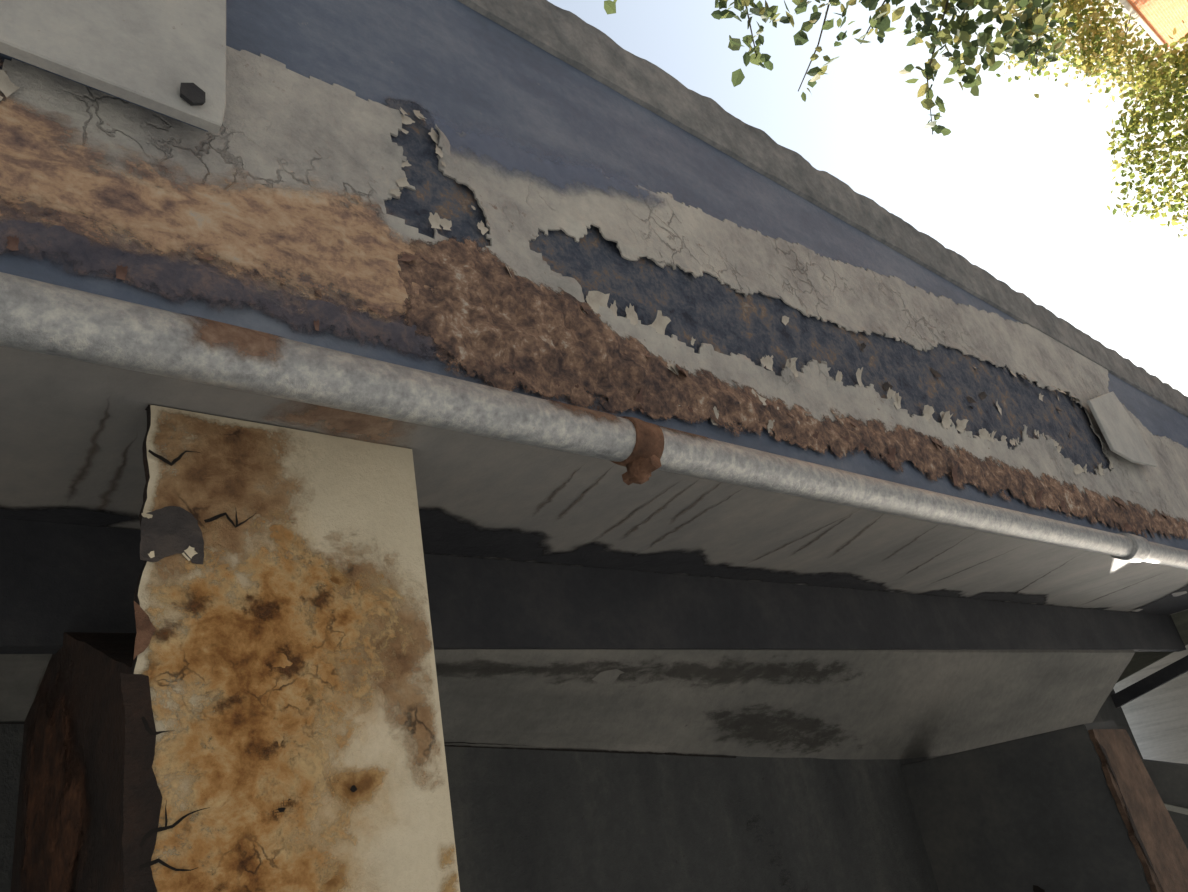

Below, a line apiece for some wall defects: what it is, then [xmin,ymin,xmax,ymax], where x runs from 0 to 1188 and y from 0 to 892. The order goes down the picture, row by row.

peeling [384,98,659,253]
corrosion [0,90,1188,539]
peeling [529,225,1113,476]
peeling [140,506,204,564]
corrosion [120,404,440,892]
water stain [436,661,850,684]
water stain [715,708,842,751]